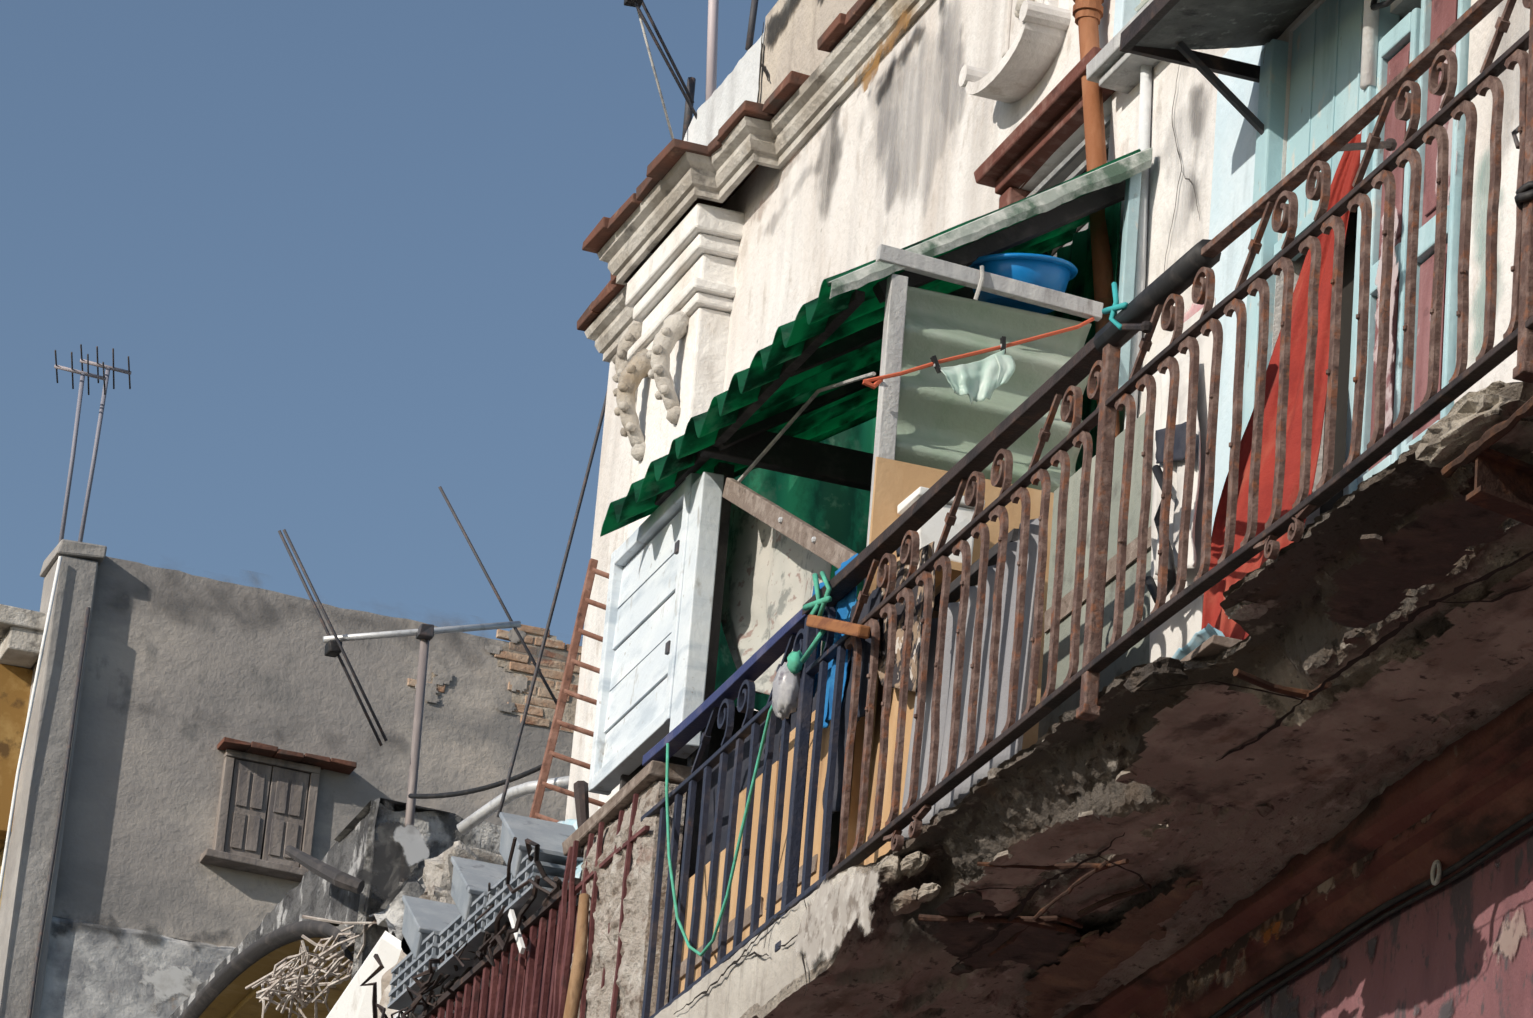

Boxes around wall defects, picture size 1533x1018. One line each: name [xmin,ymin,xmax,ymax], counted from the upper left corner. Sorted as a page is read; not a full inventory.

leakage [765,0,798,47]
leakage [816,105,840,212]
peeling [1359,534,1386,551]
flaking render [485,624,582,733]
crack [1137,551,1533,761]
peeling [795,565,1533,1018]
crack [949,833,1154,973]